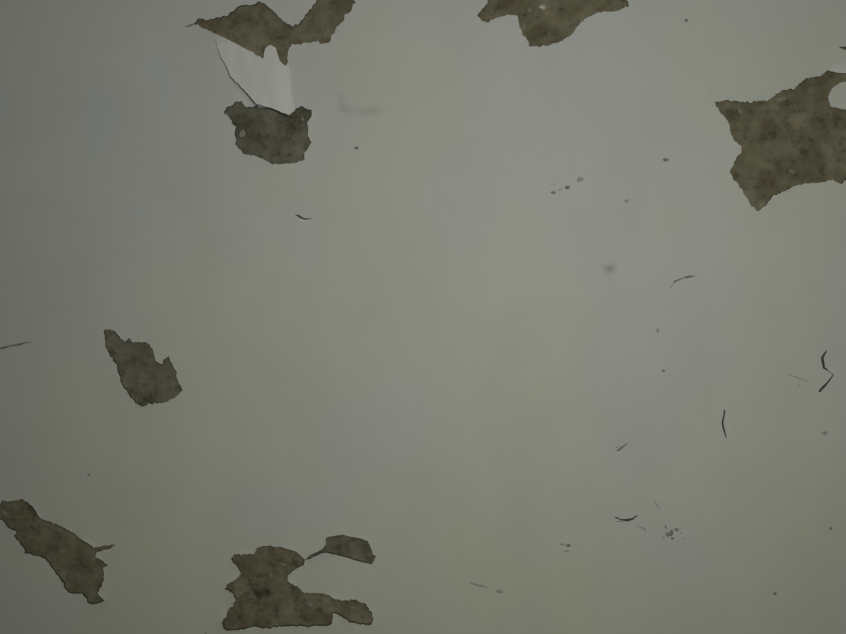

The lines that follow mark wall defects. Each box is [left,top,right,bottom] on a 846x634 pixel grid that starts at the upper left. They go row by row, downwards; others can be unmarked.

peeling [478,0,628,47]
peeling [185,0,355,164]
peeling [715,47,846,211]
peeling [105,329,182,406]
peeling [0,499,115,603]
peeling [223,535,376,629]